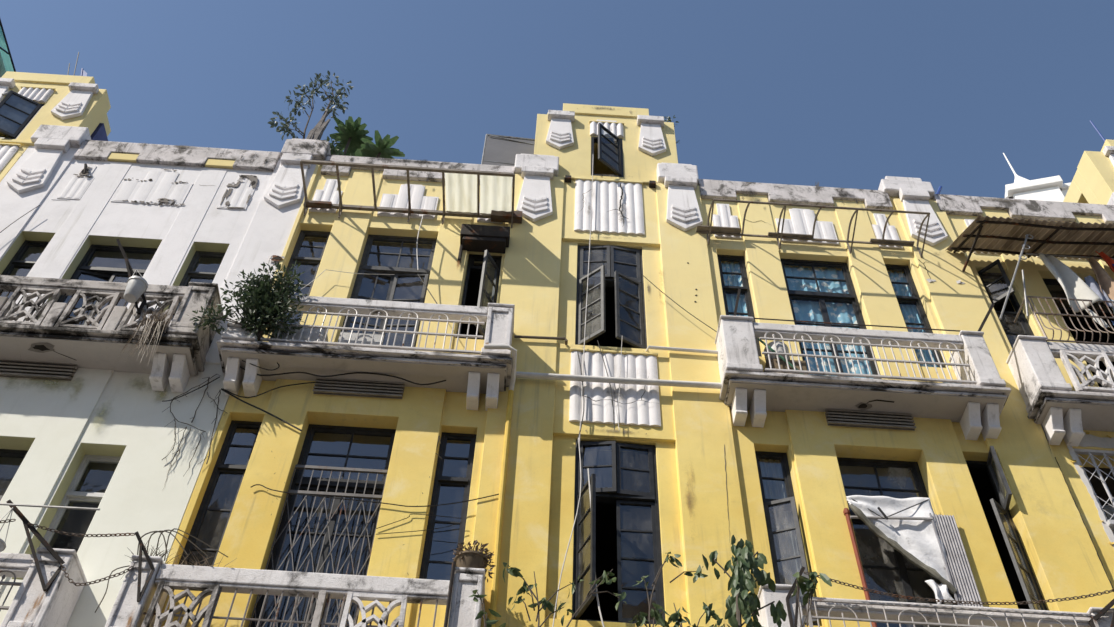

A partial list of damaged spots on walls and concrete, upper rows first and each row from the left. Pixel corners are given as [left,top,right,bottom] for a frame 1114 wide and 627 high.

spalling [220,175,258,208]
crack [583,183,628,225]